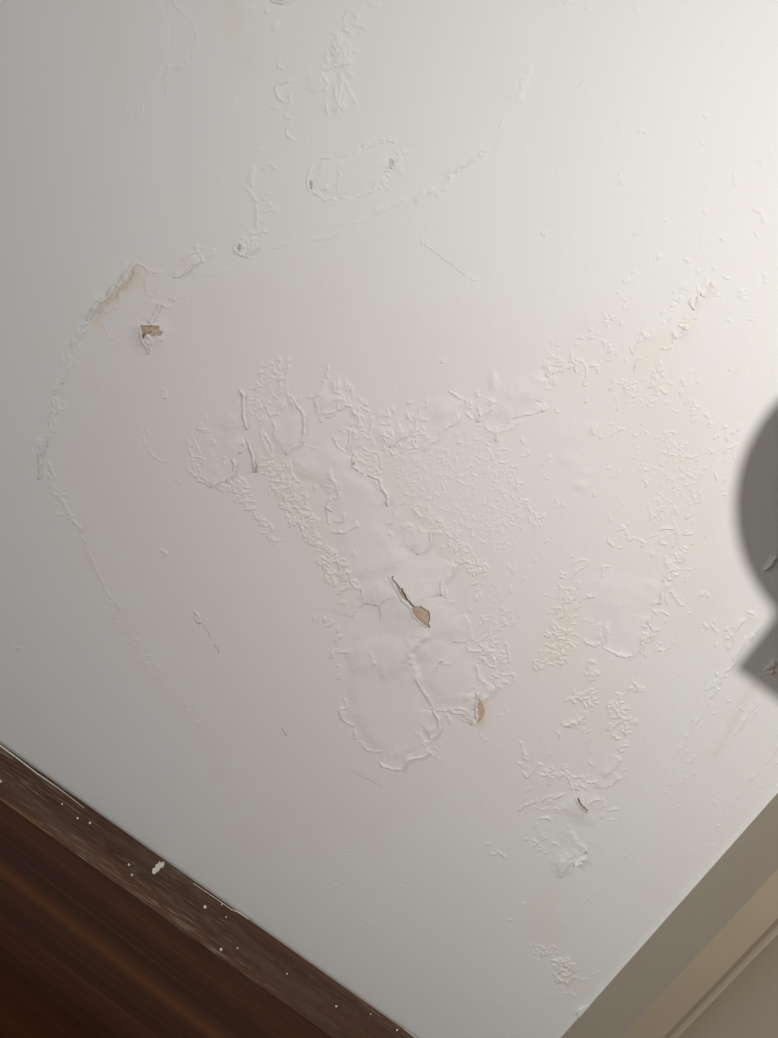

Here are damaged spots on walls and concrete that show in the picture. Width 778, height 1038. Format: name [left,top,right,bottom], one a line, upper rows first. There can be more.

flaking render [138,324,162,354]
peeling [258,429,495,771]
peeling [555,658,646,743]